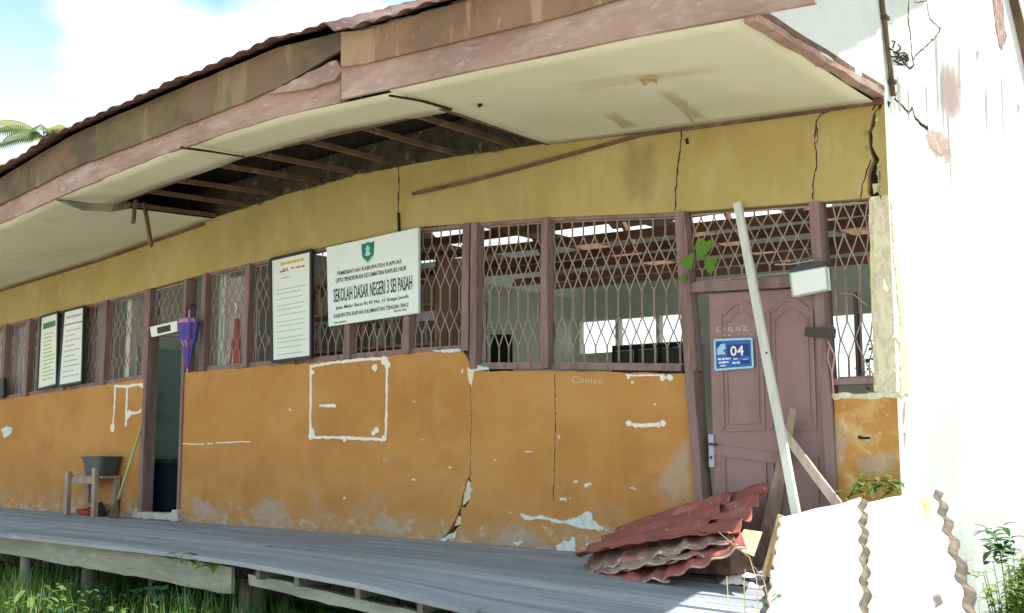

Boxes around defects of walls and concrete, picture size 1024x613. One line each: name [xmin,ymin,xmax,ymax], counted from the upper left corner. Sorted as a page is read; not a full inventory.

spalling [992,0,1007,50]
crack [860,0,941,199]
crack [395,167,403,220]
crack [674,131,689,210]
crack [810,112,828,199]
spalling [924,130,949,163]
flaking render [832,200,910,448]
crack [439,367,474,541]
crack [550,374,558,502]
peeling [509,511,608,552]